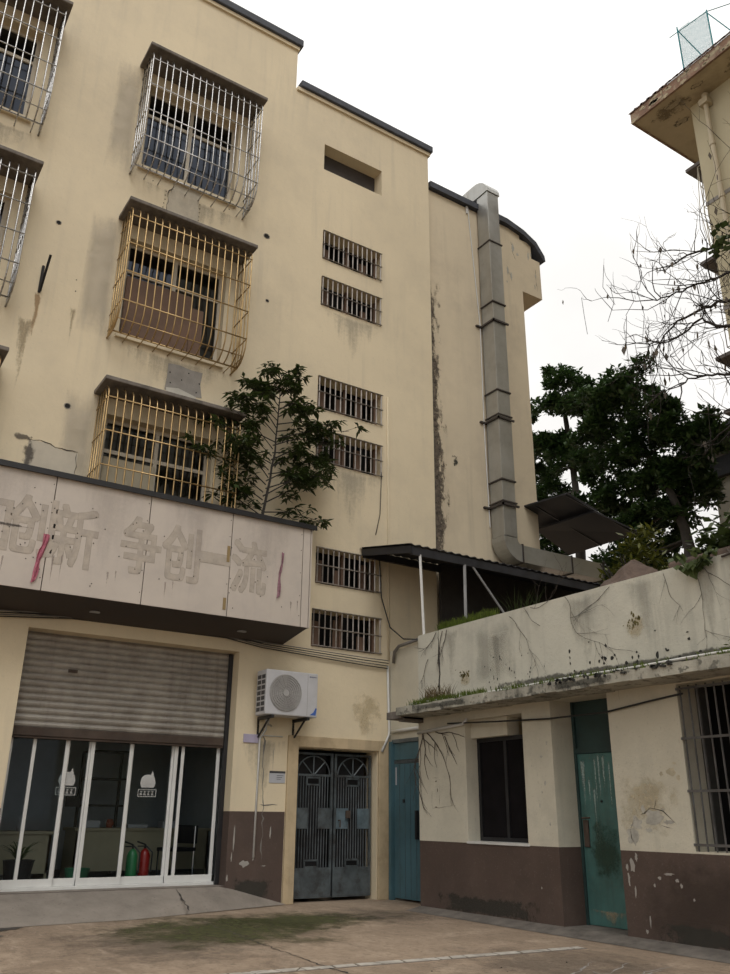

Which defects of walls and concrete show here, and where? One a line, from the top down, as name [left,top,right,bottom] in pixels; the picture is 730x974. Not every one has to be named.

leakage [431,310,449,550]
leakage [484,643,730,689]
peeling [626,805,674,897]